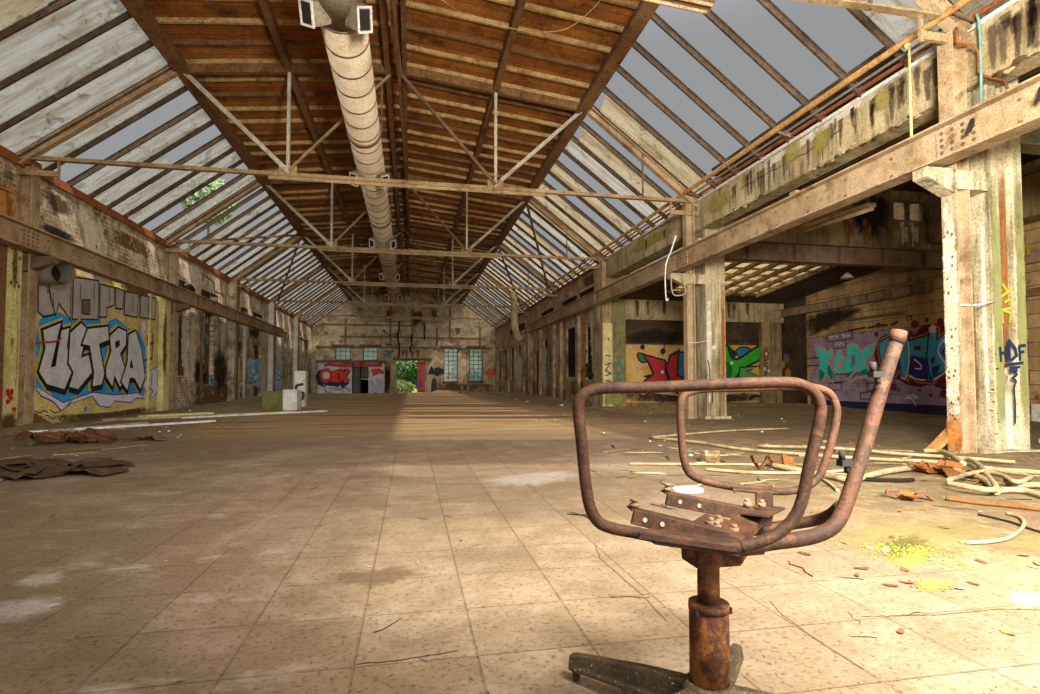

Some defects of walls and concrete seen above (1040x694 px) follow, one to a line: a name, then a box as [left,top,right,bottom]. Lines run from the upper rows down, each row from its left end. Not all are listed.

damp [988,0,1040,69]